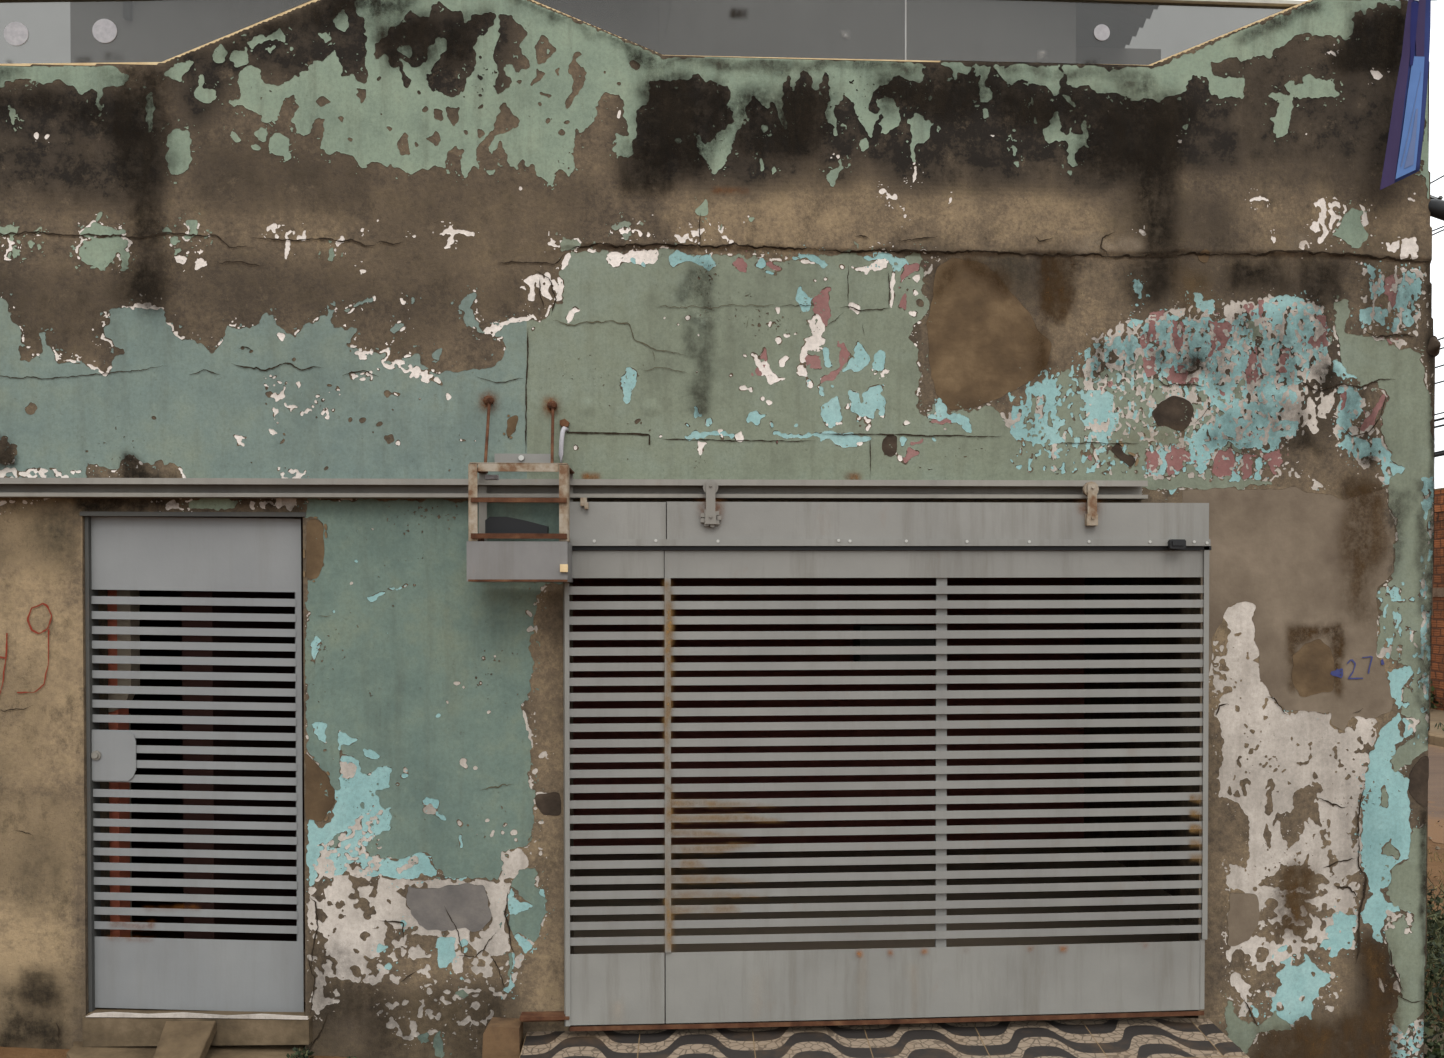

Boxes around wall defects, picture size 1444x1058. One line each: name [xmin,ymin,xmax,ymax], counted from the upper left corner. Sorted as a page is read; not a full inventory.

damp [313,0,469,63]
damp [622,57,829,191]
damp [853,61,1189,299]
peeling [70,212,137,273]
peeling [156,213,213,272]
crack [0,231,401,266]
peeling [1299,197,1376,259]
crack [478,214,1432,443]
damp [1185,354,1202,372]
crack [658,433,1000,471]
crack [1067,439,1138,447]
peeling [0,219,1434,1058]